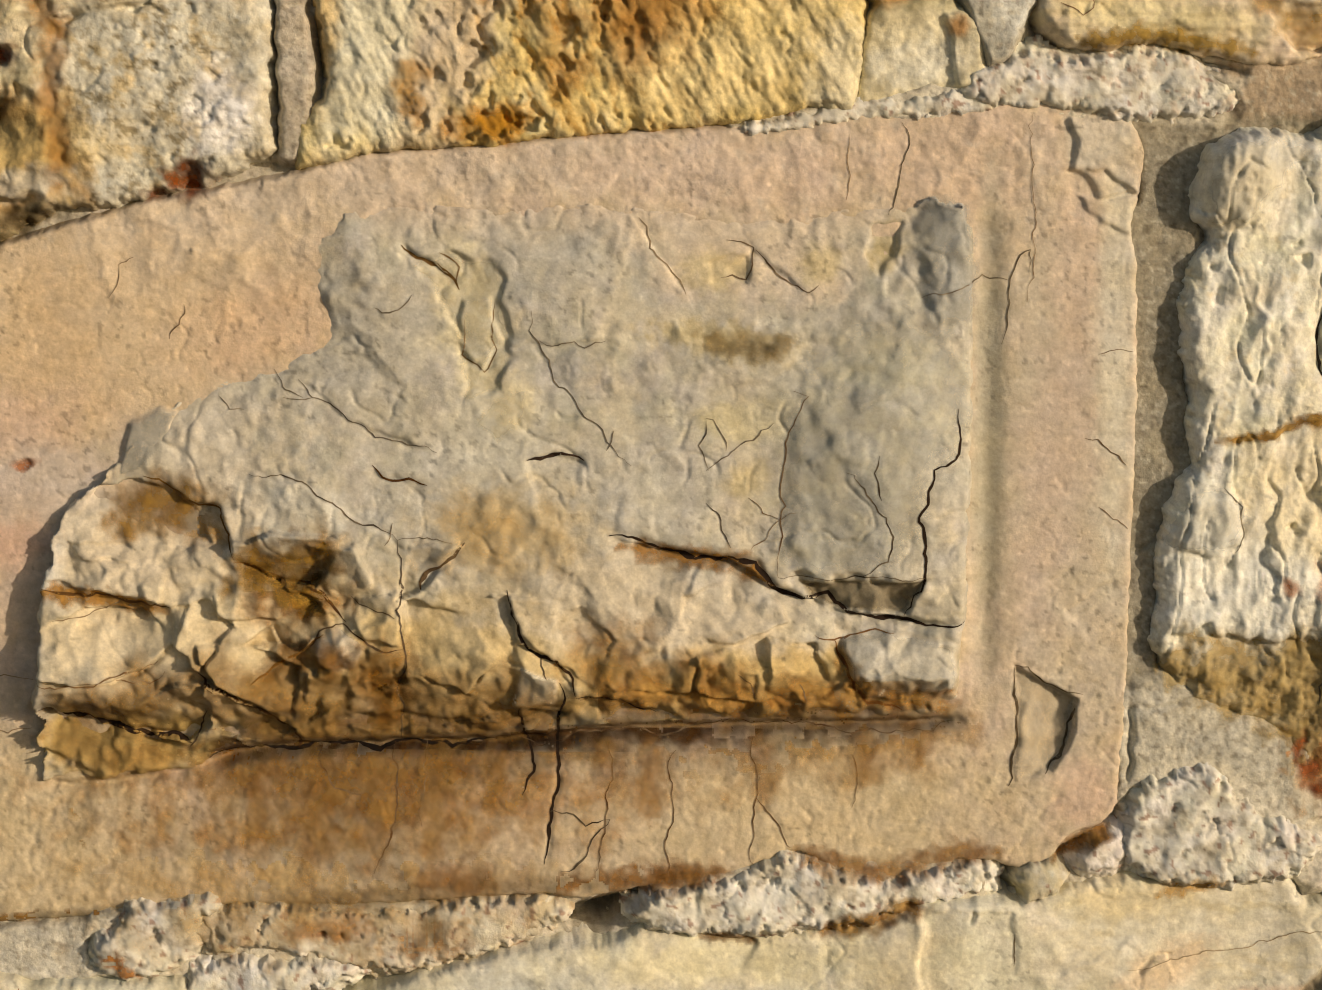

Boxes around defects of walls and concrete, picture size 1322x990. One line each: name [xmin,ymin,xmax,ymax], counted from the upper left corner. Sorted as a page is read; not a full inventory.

corrosion [0,48,11,65]
corrosion [150,160,201,197]
damp [0,205,54,242]
crack [401,245,460,290]
crack [721,240,819,293]
crack [461,304,497,373]
crack [527,312,631,466]
crack [274,369,437,486]
corrosion [16,460,33,472]
crack [0,391,964,883]
crack [1008,665,1083,786]
corrosion [1286,738,1322,796]